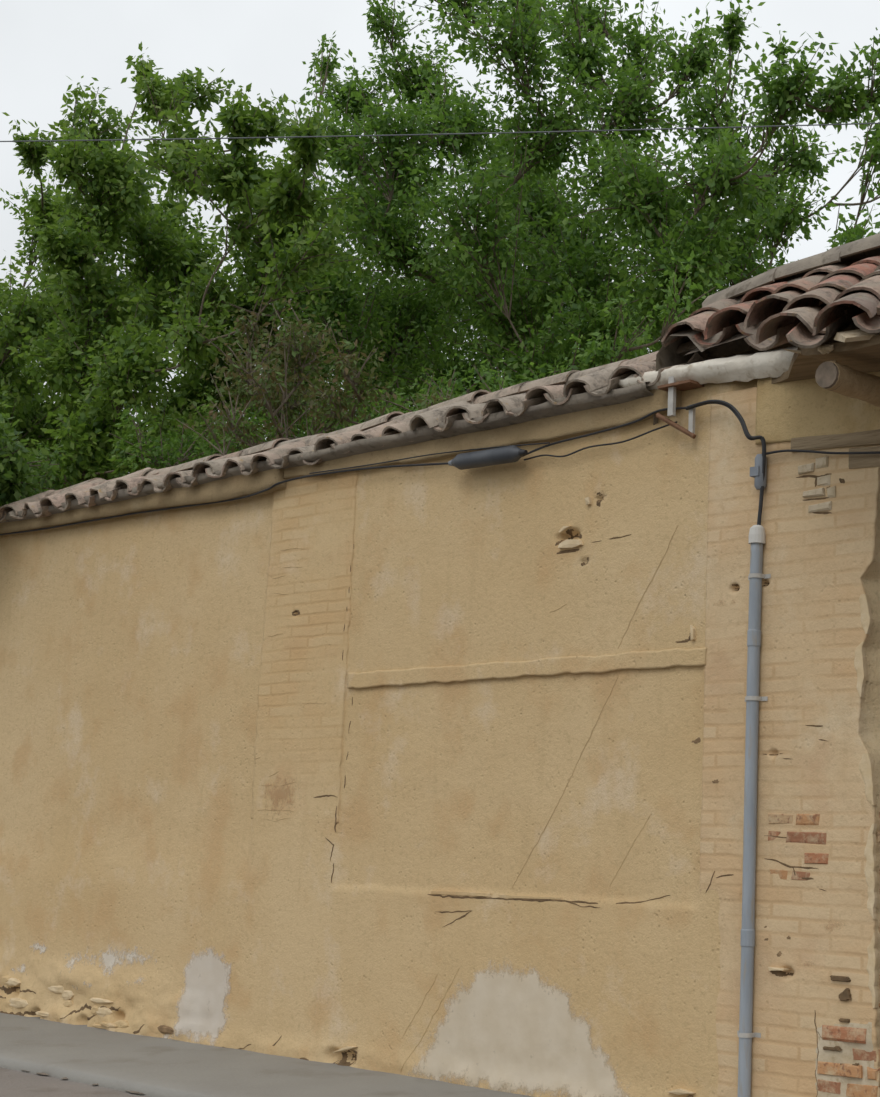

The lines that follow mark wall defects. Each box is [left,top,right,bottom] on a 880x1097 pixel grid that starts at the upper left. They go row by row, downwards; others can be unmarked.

spalling [555,526,588,566]
crack [618,526,678,649]
flaking render [854,594,873,698]
crack [428,680,670,927]
crack [706,871,733,892]
flaking render [859,753,880,1008]
flaking render [1,964,49,1017]
flaking render [157,1025,174,1034]
leakage [164,949,231,1046]
crack [400,967,460,1073]
flaking render [830,975,852,1001]
flaking render [815,1018,880,1097]